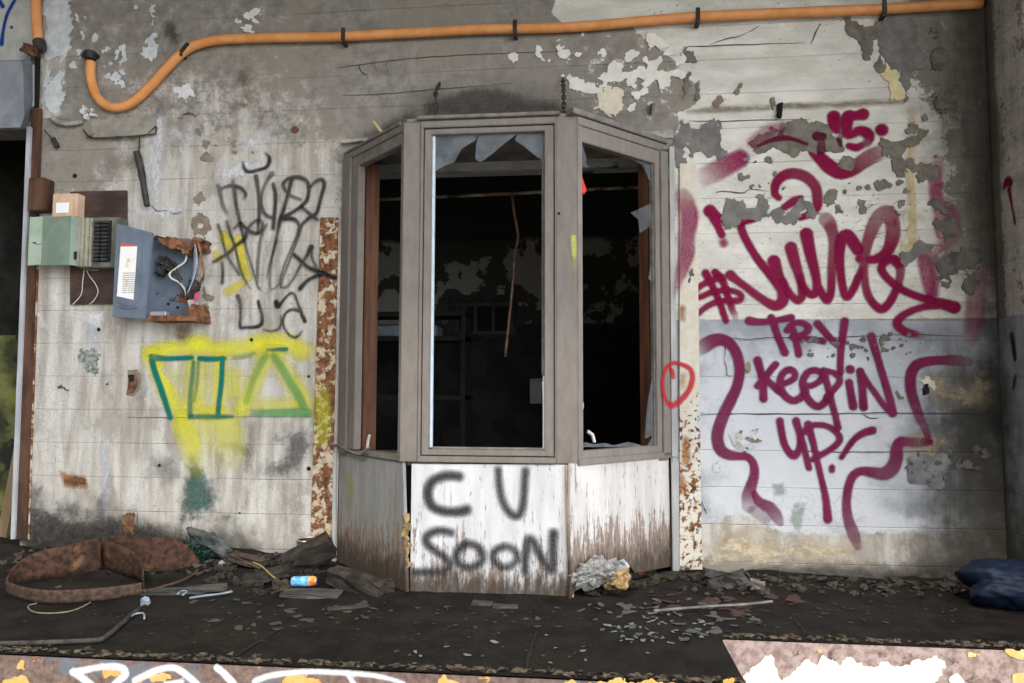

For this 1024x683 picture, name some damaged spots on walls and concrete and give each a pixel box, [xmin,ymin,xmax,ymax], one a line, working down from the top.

peeling [42,0,128,115]
peeling [134,4,159,62]
peeling [235,8,261,33]
peeling [535,31,743,168]
peeling [844,12,951,102]
peeling [720,87,962,230]
peeling [899,198,984,295]
rust [60,472,87,488]
water stain [25,448,191,547]
water stain [181,468,216,521]
rust [680,437,690,493]
spalling [905,444,991,489]